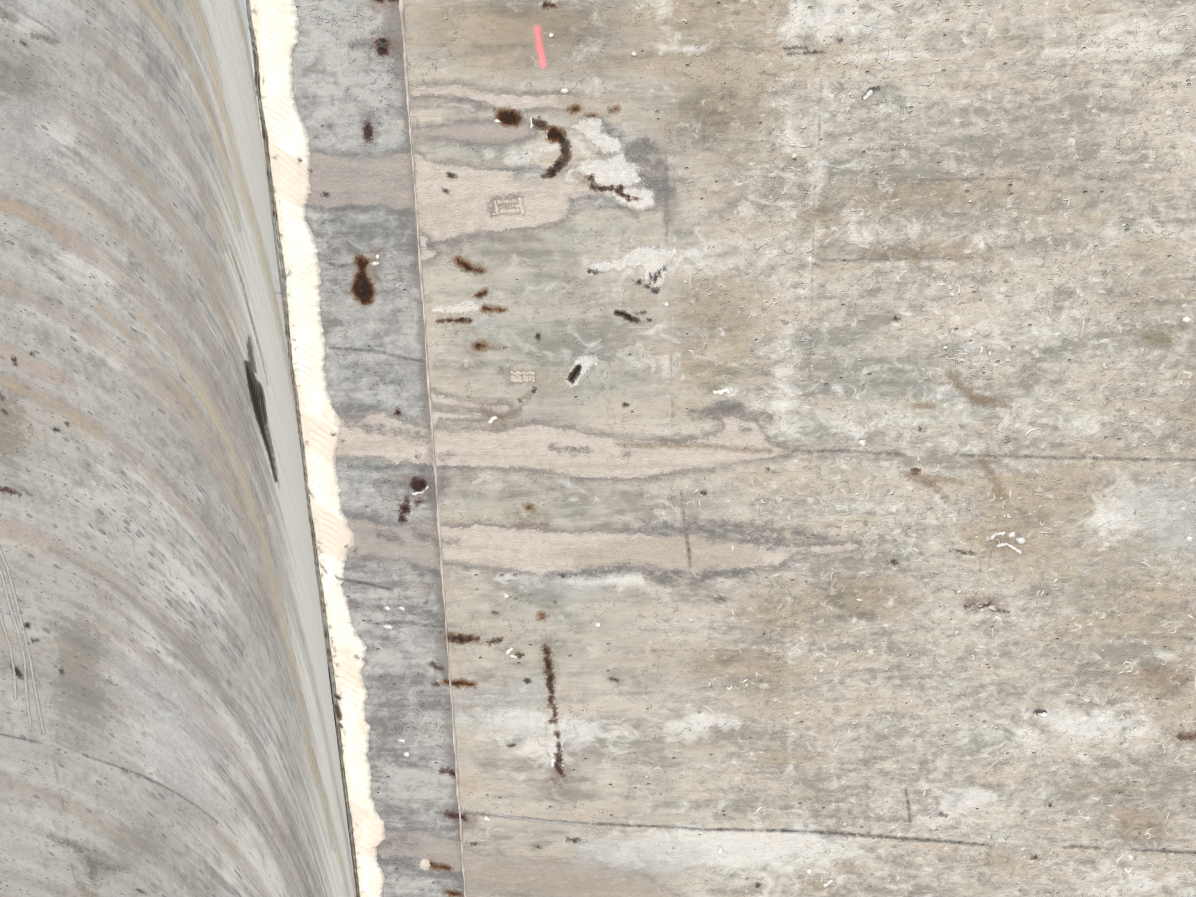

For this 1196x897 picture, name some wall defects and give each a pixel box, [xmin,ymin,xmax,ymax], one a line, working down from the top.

rust [375,38,391,57]
rust [494,109,571,178]
rust [577,173,638,202]
rust [350,254,380,305]
rust [455,256,484,275]
rust [437,288,506,324]
spalling [244,337,279,486]
rust [398,475,445,522]
rust [445,633,502,644]
rust [430,661,476,688]
rust [543,645,565,777]